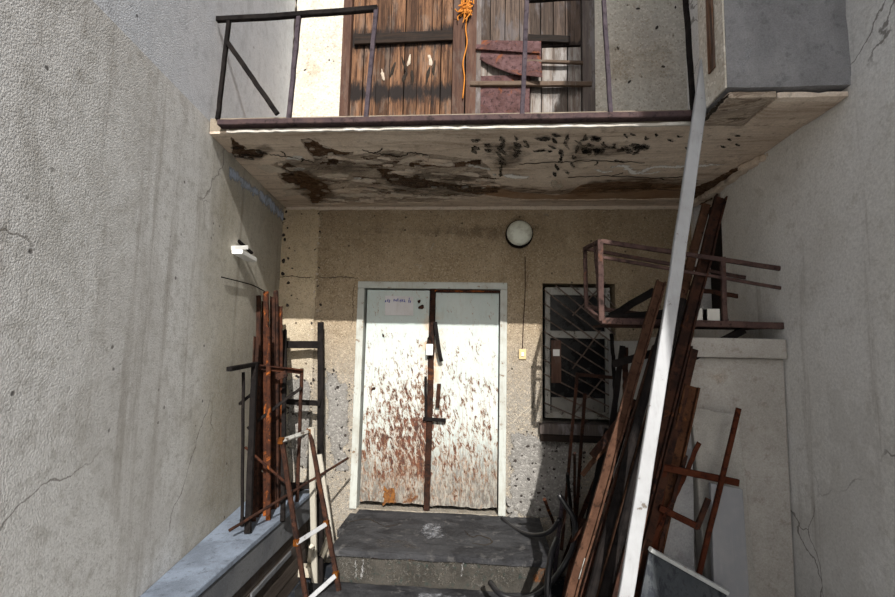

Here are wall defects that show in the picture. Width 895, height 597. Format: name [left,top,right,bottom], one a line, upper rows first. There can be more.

damp [387,133,684,199]
peeling [229,137,501,336]
flaking render [286,366,352,478]
corrosion [382,486,418,506]
flaking render [508,431,586,518]